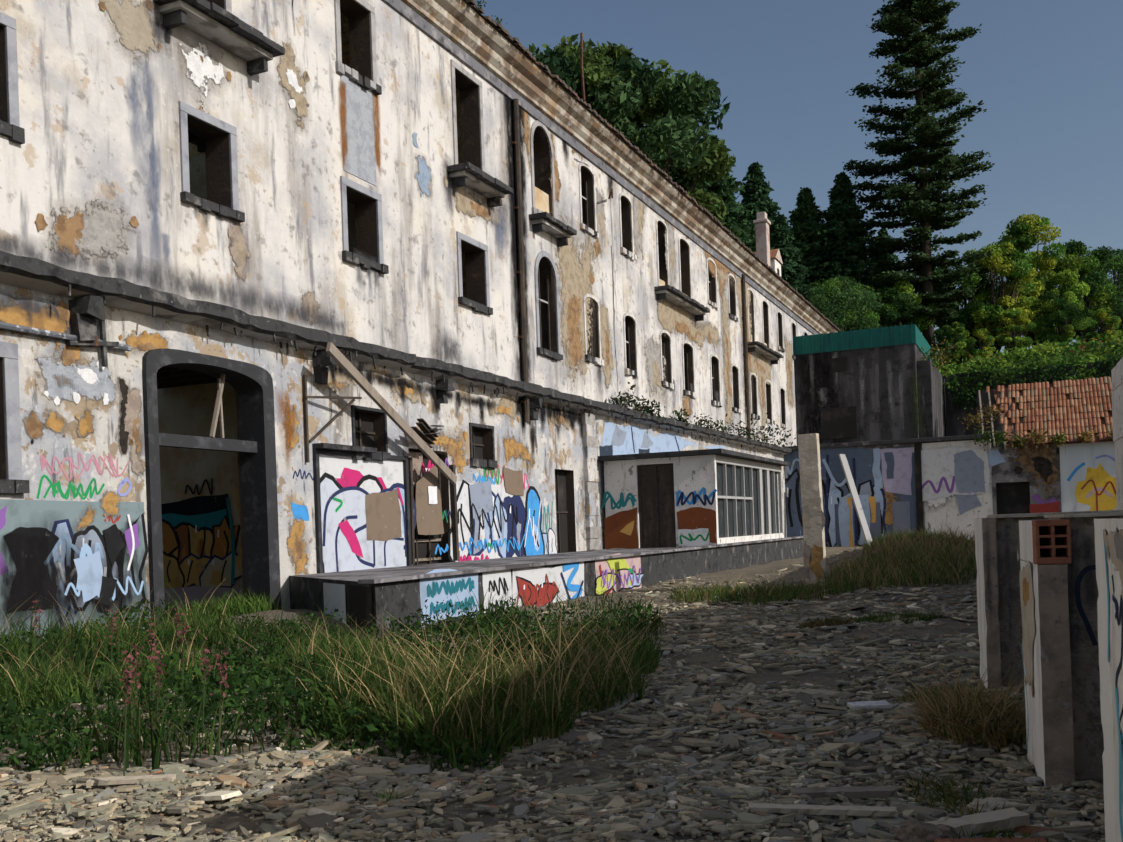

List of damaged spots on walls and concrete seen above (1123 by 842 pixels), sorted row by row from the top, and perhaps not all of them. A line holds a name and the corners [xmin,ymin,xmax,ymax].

flaking render [99,0,162,59]
leakage [130,75,153,135]
peeling [177,41,231,112]
peeling [277,42,310,130]
flaking render [35,199,139,261]
leakage [150,151,169,258]
flaking render [412,132,505,228]
leakage [0,238,340,329]
peeling [0,296,145,475]
peeling [1103,527,1123,598]